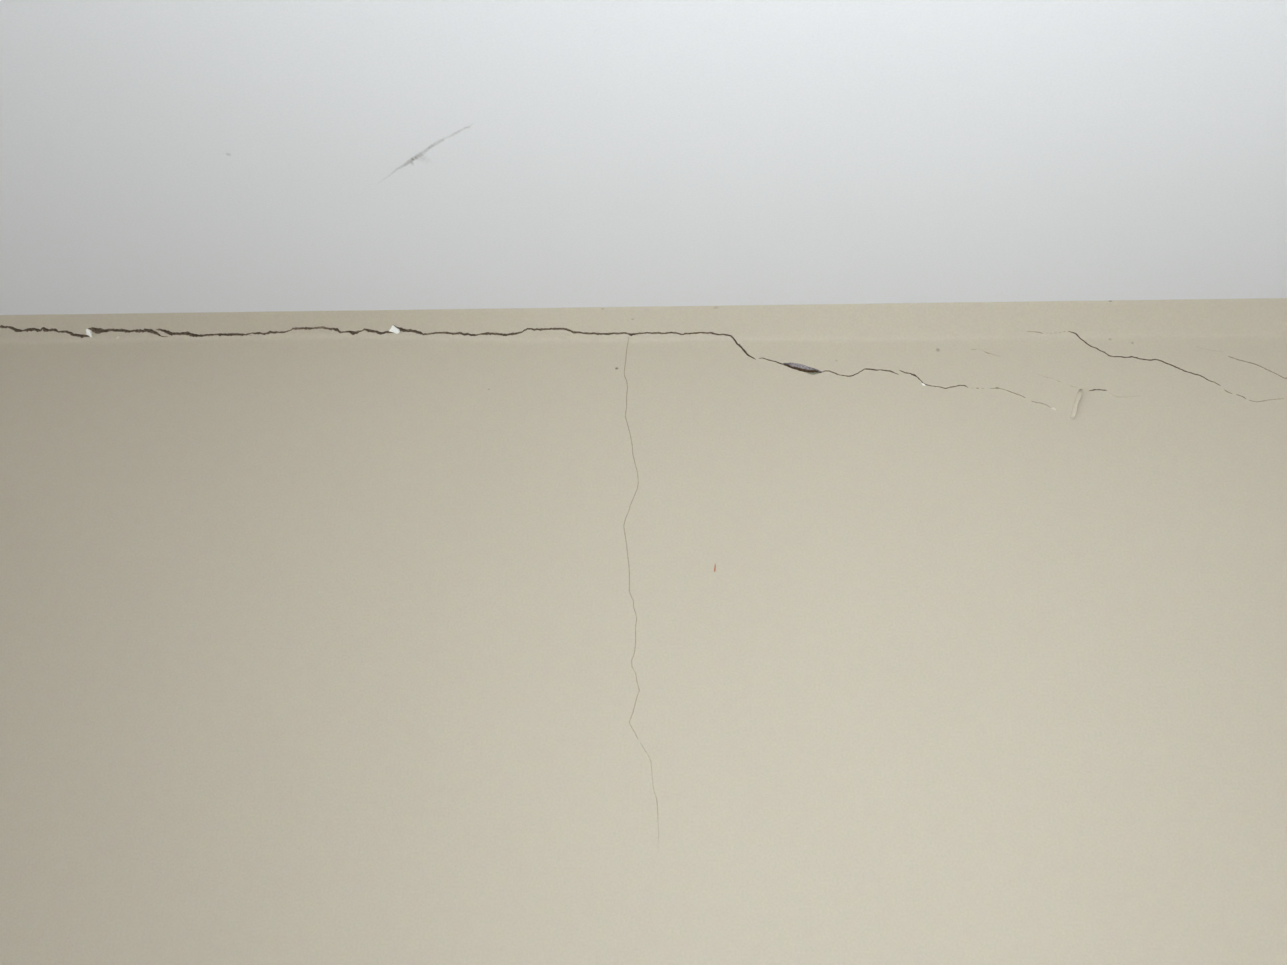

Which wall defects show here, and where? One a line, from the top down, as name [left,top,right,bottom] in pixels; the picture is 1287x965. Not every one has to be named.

crack [822,334,1138,410]
crack [1026,331,1287,402]
crack [0,325,783,852]